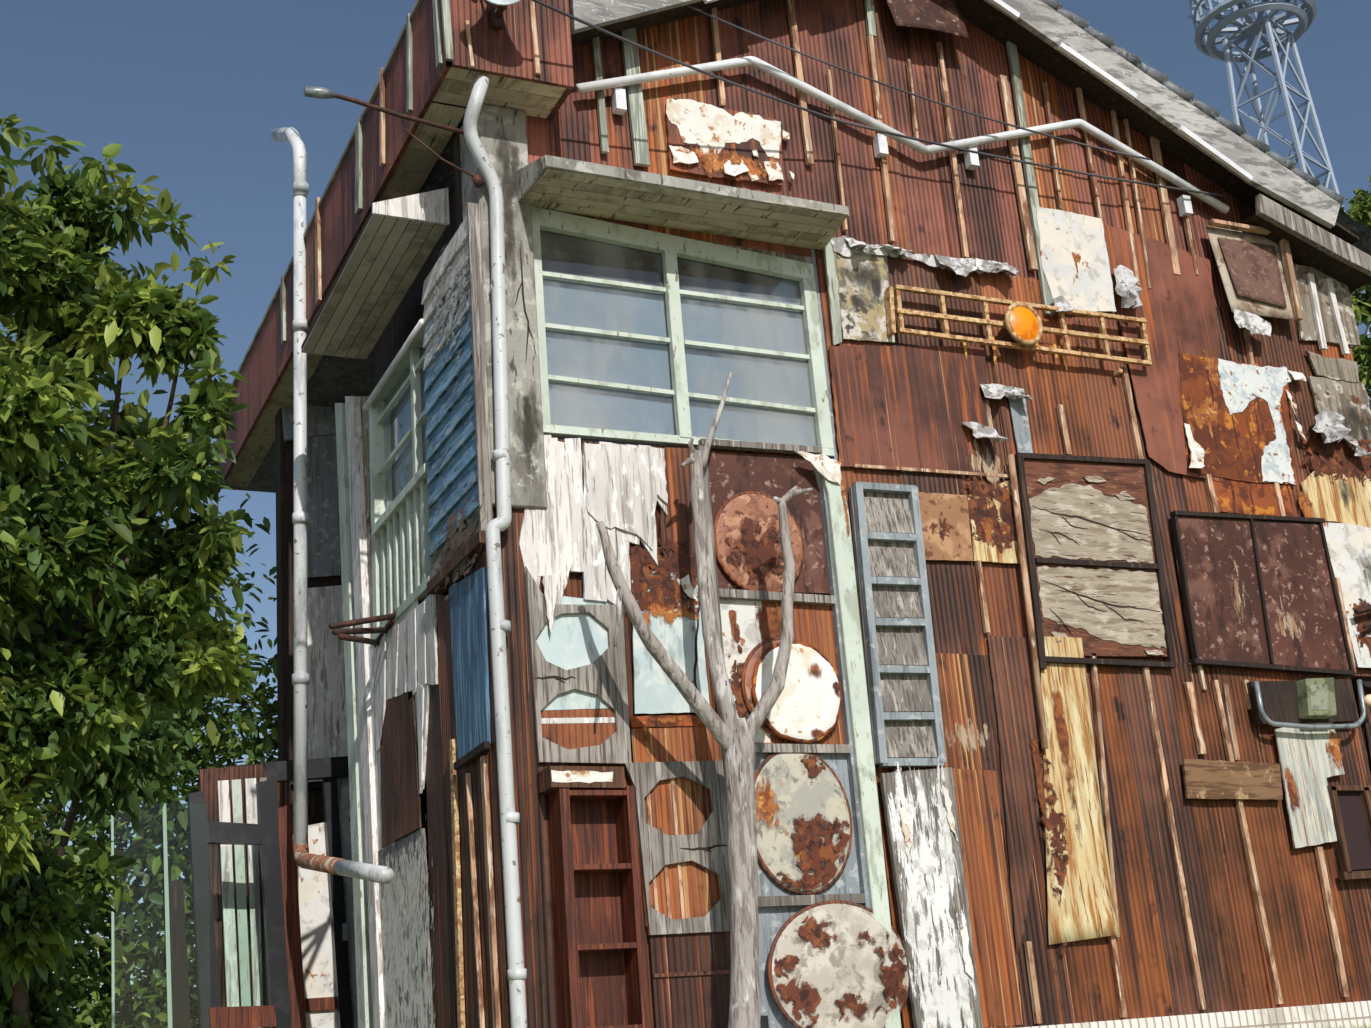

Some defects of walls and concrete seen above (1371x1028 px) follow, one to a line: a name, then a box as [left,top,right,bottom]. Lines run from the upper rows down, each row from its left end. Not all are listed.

peeling [666,98,794,181]
peeling [1184,423,1205,468]
peeling [1218,359,1307,485]
corrosion [526,0,1371,1028]
crack [1032,505,1150,546]
crack [1042,580,1160,637]
peeling [377,815,435,1028]
peeling [887,756,977,1028]